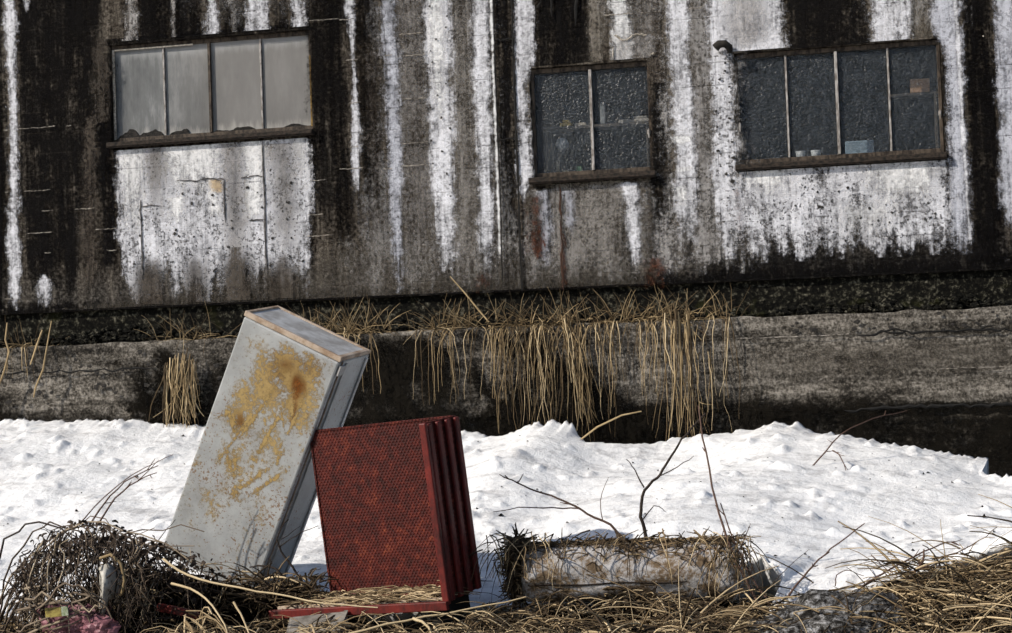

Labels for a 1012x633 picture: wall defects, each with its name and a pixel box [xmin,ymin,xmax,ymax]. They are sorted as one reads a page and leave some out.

leakage [0,0,1012,315]
corrosion [527,197,546,260]
crack [857,325,1012,337]
leakage [0,345,228,427]
leakage [343,331,1012,477]